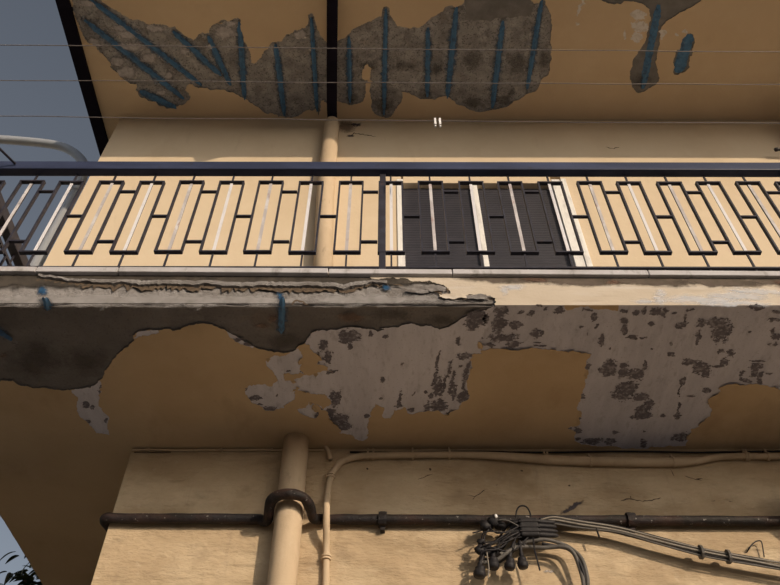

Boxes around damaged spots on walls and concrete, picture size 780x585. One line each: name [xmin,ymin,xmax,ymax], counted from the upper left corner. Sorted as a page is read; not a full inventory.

spalling [72,0,327,118]
spalling [337,0,552,118]
spalling [602,0,701,93]
peeling [0,274,780,449]